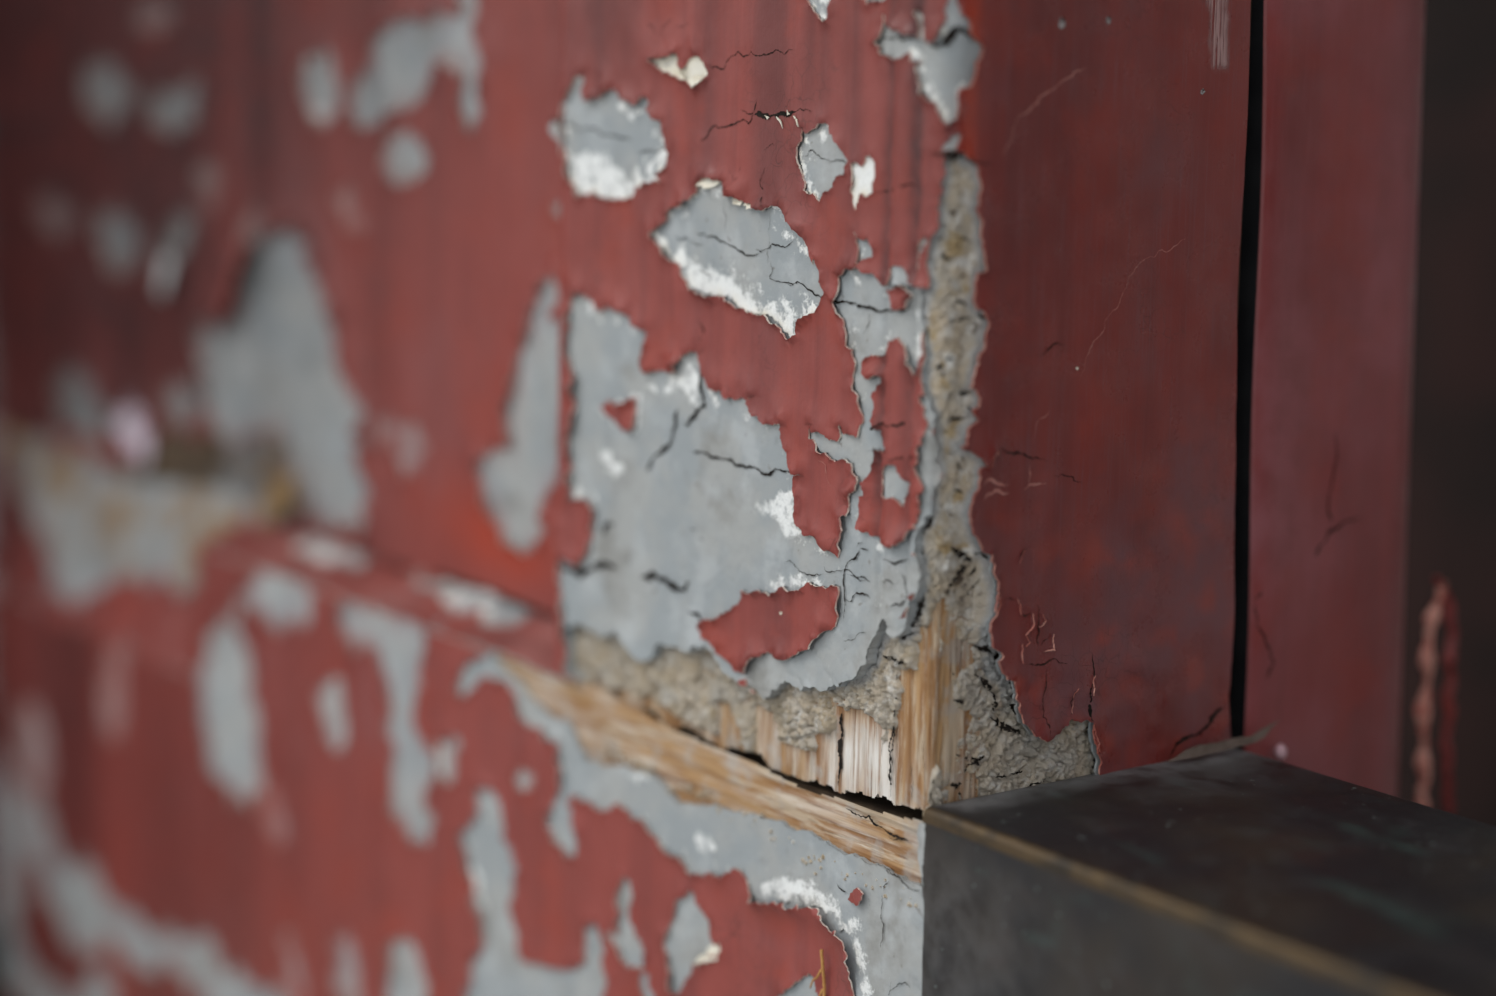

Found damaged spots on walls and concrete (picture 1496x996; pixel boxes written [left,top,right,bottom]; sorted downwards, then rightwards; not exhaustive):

peeling [86,60,136,127]
peeling [302,0,482,186]
peeling [0,228,427,607]
flaking render [458,0,1094,996]
peeling [0,699,285,996]
peeling [200,568,311,806]
peeling [319,677,348,752]
peeling [340,599,461,845]
peeling [413,572,533,627]
crack [838,677,925,844]
peeling [335,932,362,996]
peeling [387,936,429,996]